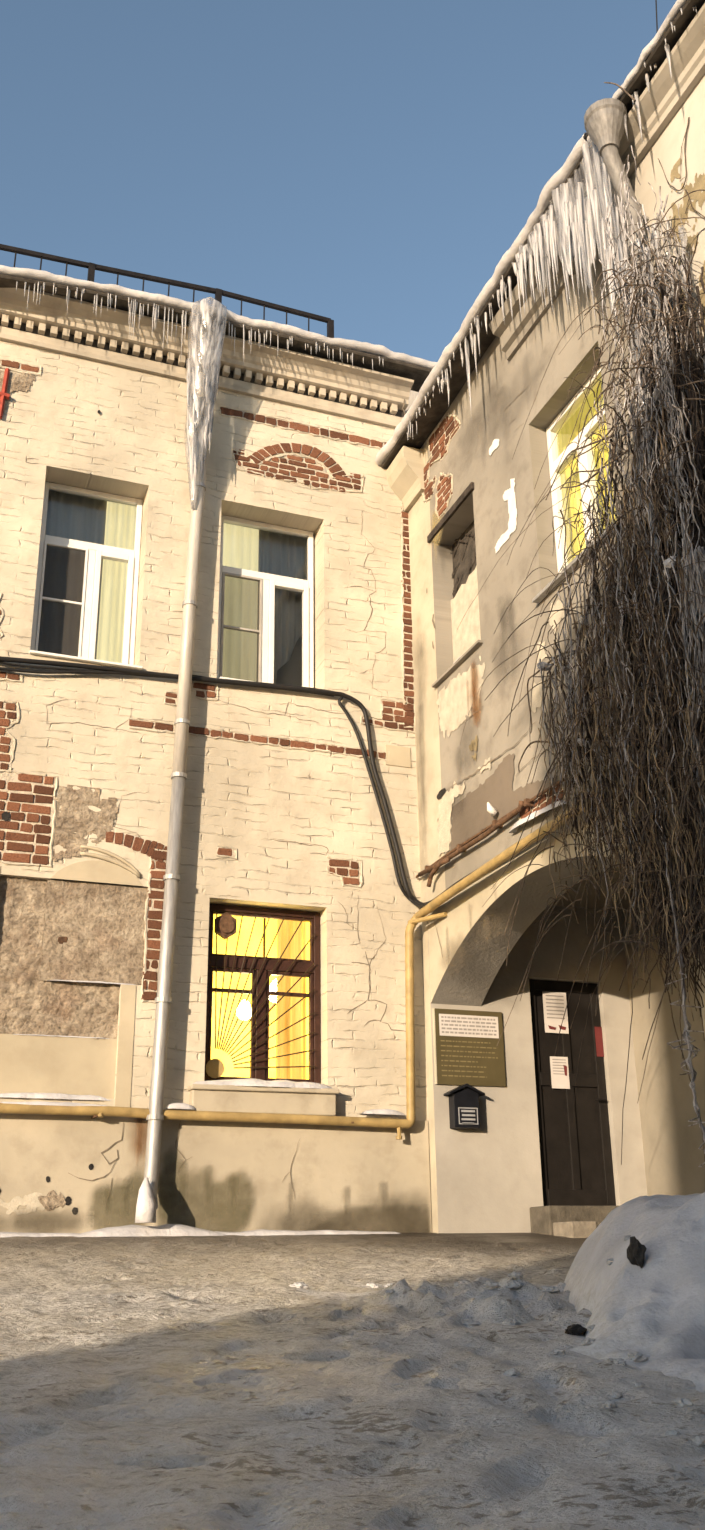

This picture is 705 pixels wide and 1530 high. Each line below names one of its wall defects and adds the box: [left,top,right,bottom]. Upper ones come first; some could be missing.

peeling [669,158,705,346]
spalling [0,358,42,413]
flaking render [232,448,365,494]
flaking render [219,405,387,449]
flaking render [421,413,461,518]
peeling [495,478,517,553]
flaking render [360,501,416,734]
peeling [530,599,564,713]
flaking render [128,681,389,761]
peeling [436,656,491,856]
spalling [0,700,167,1040]
water stain [15,1157,251,1232]